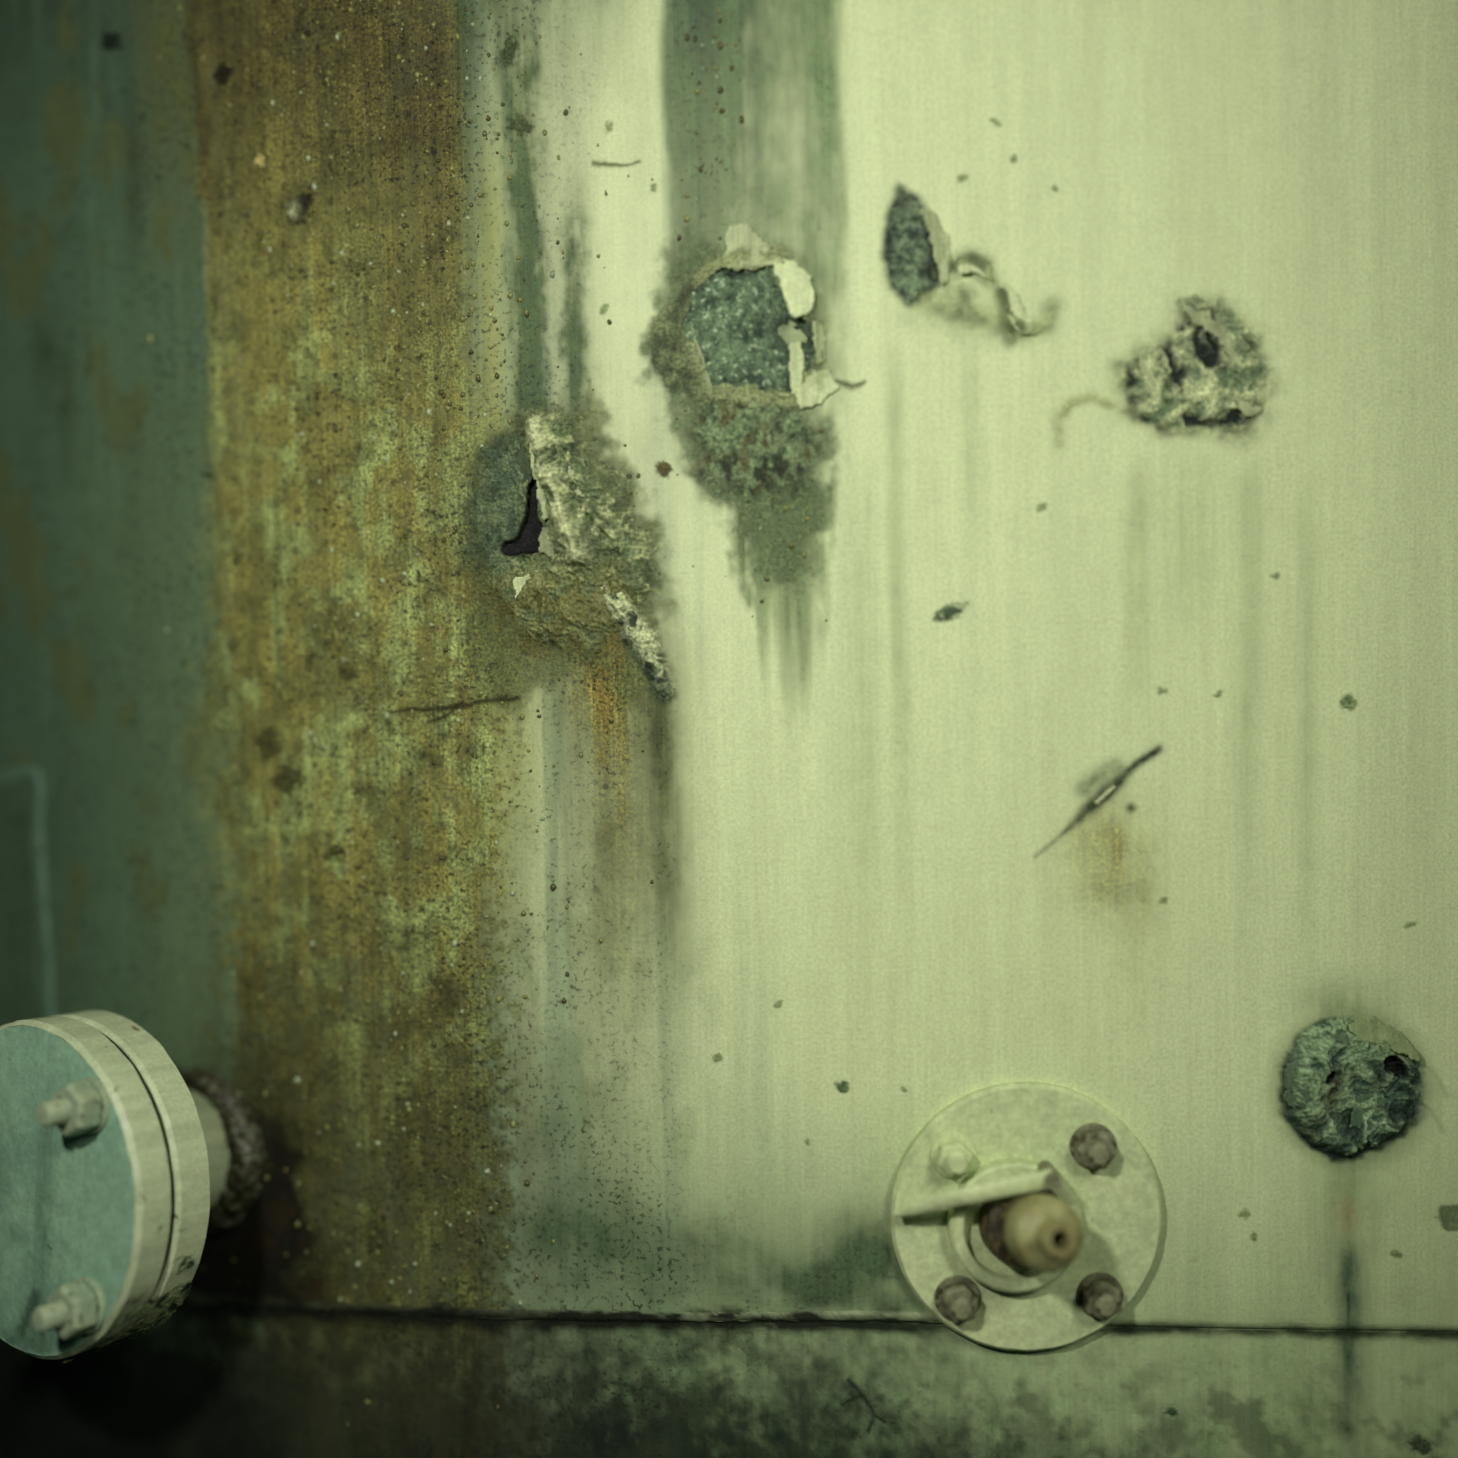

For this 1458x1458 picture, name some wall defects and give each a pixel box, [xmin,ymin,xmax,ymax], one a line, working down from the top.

damp [664,0,836,284]
peeling [883,185,1042,339]
spalling [641,223,839,582]
damp [739,483,824,637]
corrosion [176,0,947,1367]
damp [648,688,671,803]
damp [781,1229,891,1307]
corrosion [1100,1324,1458,1339]